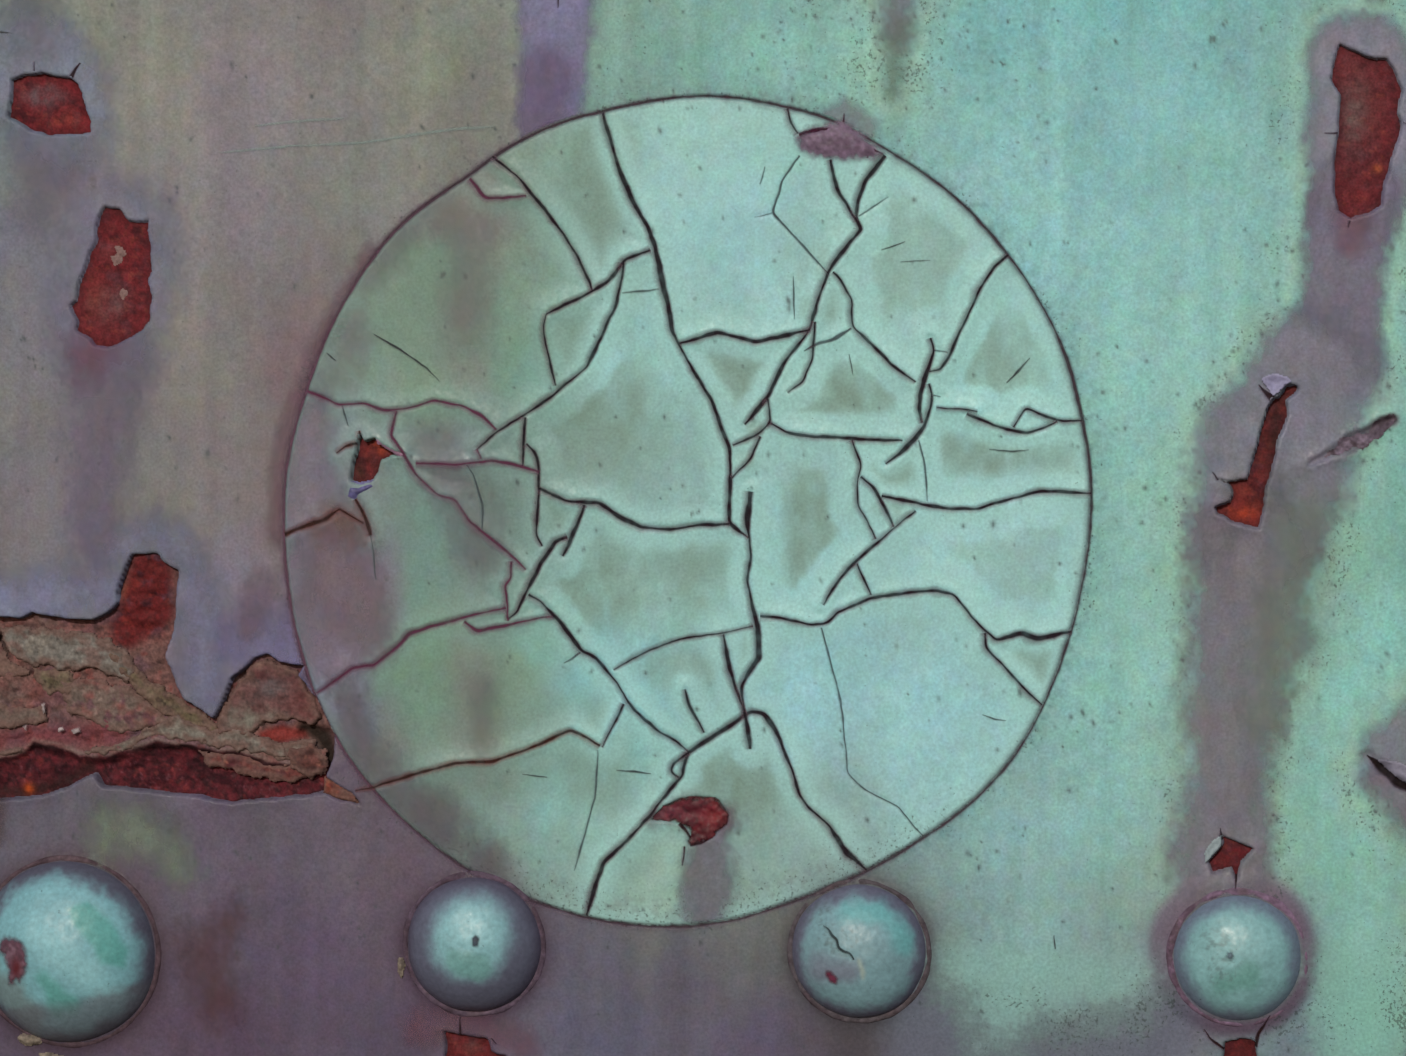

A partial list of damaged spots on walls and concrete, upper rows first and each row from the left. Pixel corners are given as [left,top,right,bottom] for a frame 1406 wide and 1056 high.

peeling [11,63,91,135]
peeling [1332,46,1405,228]
peeling [73,208,152,347]
peeling [353,438,403,482]
peeling [1213,374,1297,527]
crack [284,498,376,578]
crack [307,108,1090,915]
spalling [0,553,359,803]
peeling [653,796,728,866]
peeling [1204,828,1252,889]
rust [0,938,27,983]
peeling [1204,1016,1270,1056]